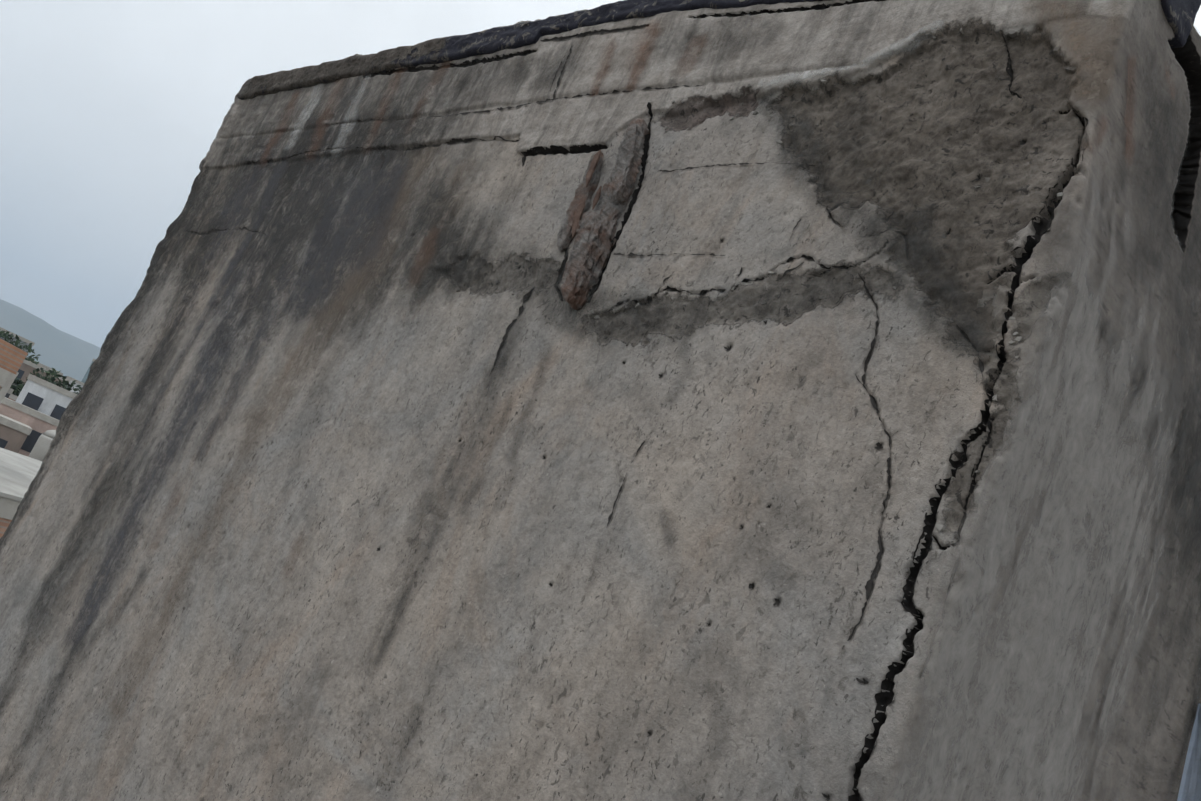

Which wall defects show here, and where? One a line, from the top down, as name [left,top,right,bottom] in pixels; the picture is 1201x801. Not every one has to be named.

damp [0,94,491,682]
crack [245,24,909,641]
flaking render [581,18,1091,539]
crack [848,107,1088,801]
crack [1001,33,1022,98]